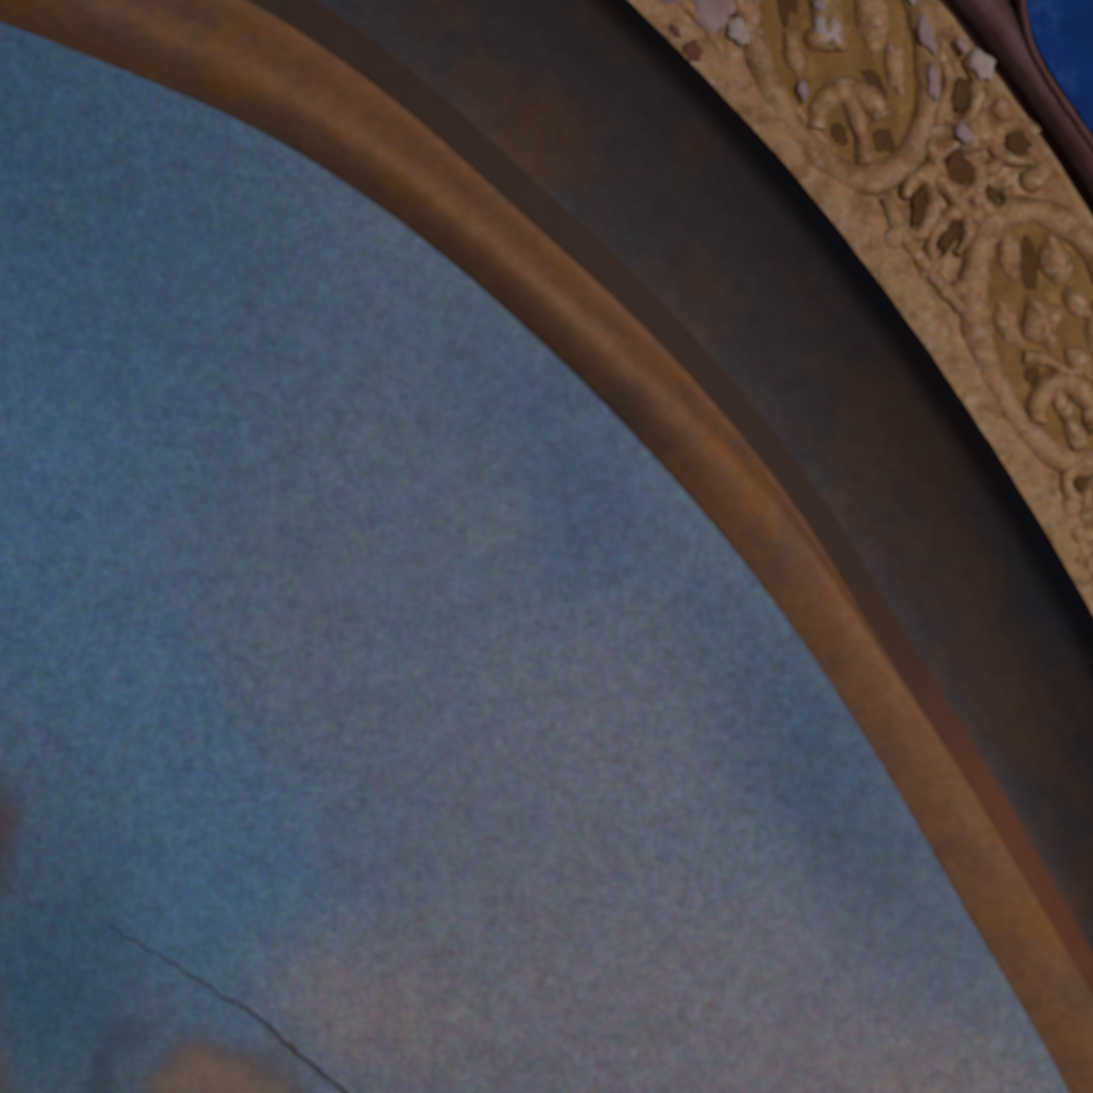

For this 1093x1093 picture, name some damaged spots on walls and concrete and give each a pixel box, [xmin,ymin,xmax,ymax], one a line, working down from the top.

crack [110,925,356,1093]